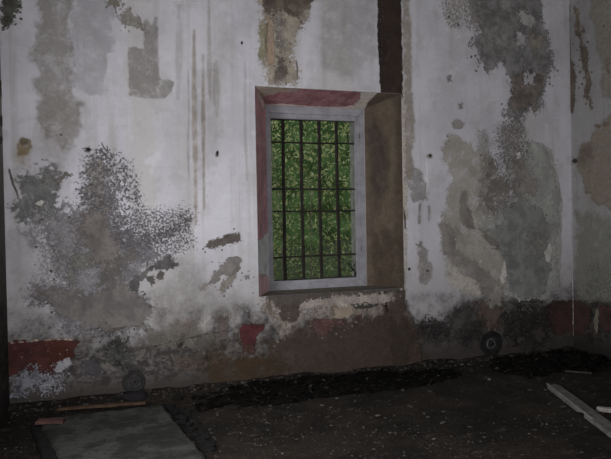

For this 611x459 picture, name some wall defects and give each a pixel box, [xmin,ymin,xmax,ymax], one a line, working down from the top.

spalling [8,142,200,402]
damp [148,319,218,352]
peeling [198,0,415,355]
damp [438,119,509,310]
spalling [411,0,611,350]